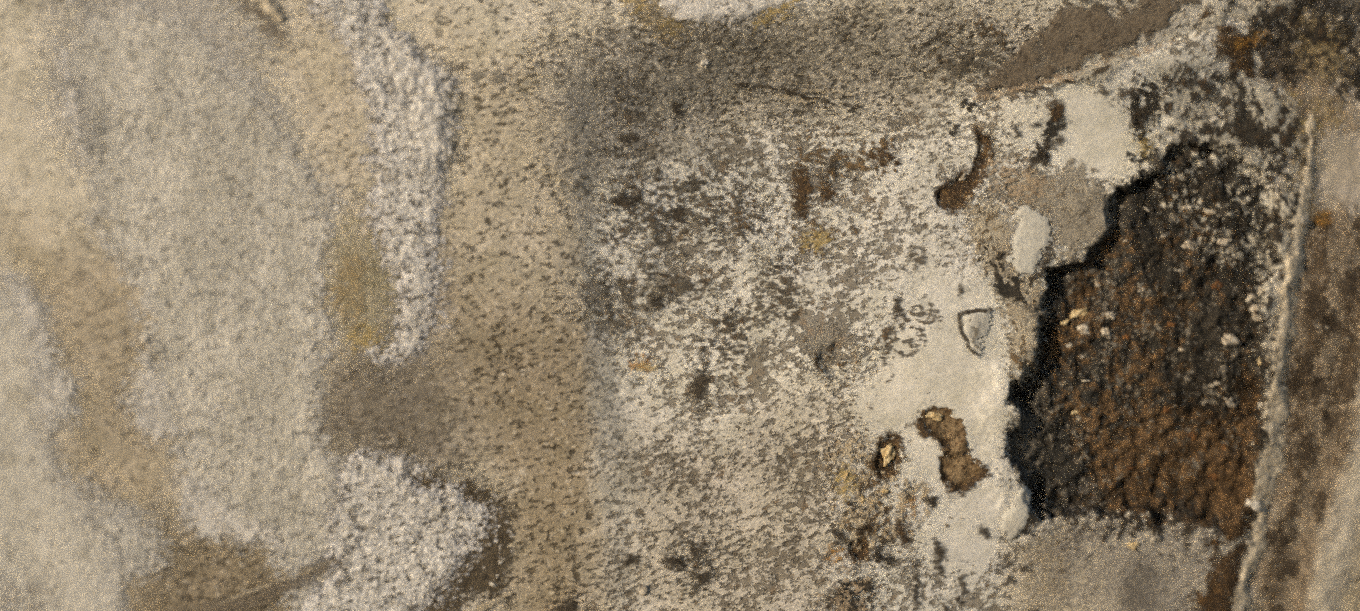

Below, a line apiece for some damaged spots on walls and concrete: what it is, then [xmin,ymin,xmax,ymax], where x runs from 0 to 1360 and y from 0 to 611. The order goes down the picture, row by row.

mould [1213,0,1360,186]
peeling [574,121,899,416]
spalling [813,8,1312,611]
spalling [624,553,640,565]
peeling [658,530,715,607]